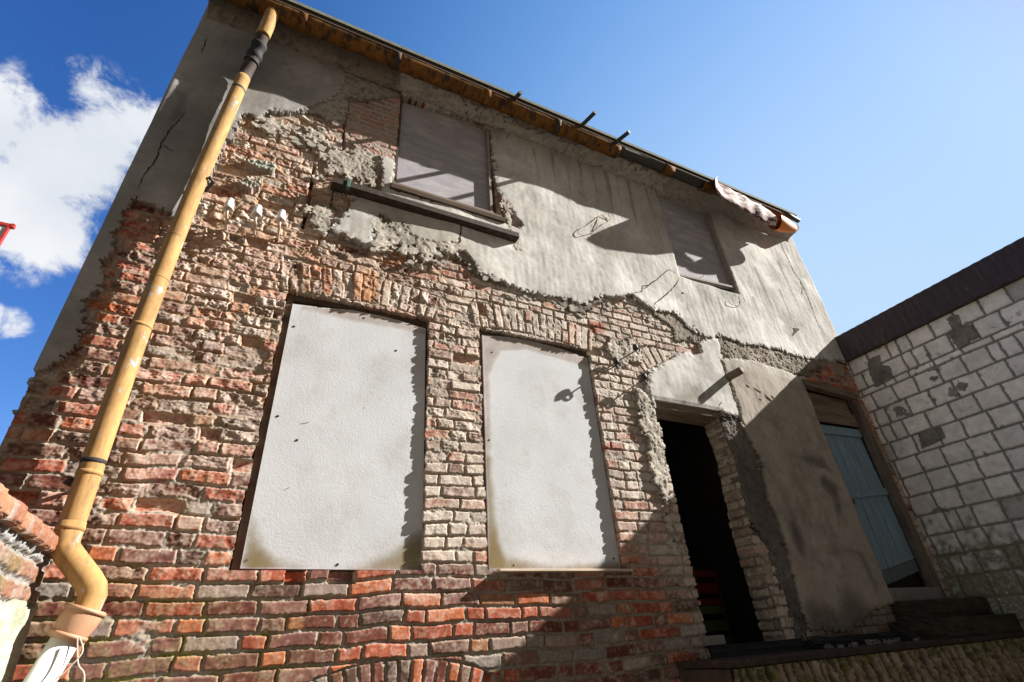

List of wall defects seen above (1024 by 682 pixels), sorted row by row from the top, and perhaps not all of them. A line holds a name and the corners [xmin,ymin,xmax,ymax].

crack [138,112,185,188]
flaking render [251,115,382,188]
flaking render [397,73,671,192]
flaking render [303,195,539,301]
flaking render [600,335,648,368]
flaking render [553,297,700,344]
crack [631,269,703,306]
flaking render [717,337,821,378]
flaking render [632,388,681,564]
flaking render [715,410,812,640]